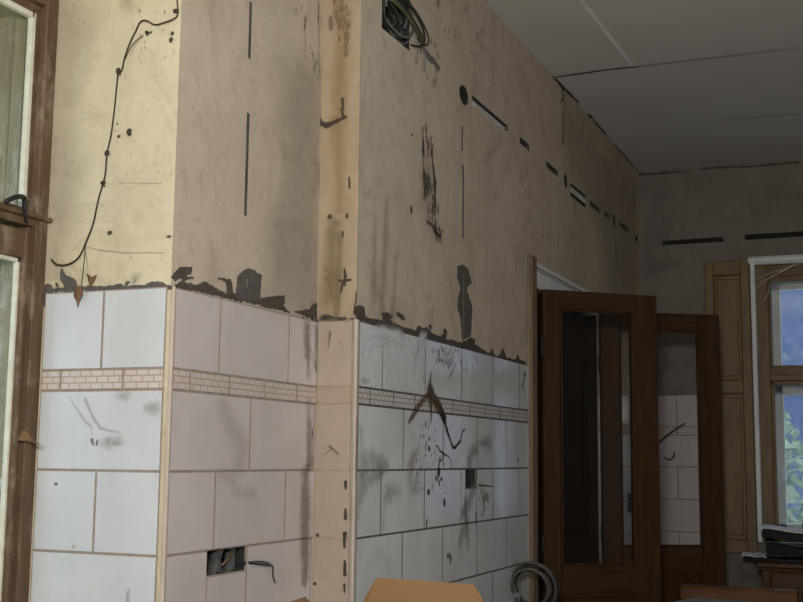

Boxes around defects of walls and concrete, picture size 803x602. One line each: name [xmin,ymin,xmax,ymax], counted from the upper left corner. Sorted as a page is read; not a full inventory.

water stain [422,126,443,243]
peeling [43,266,526,365]